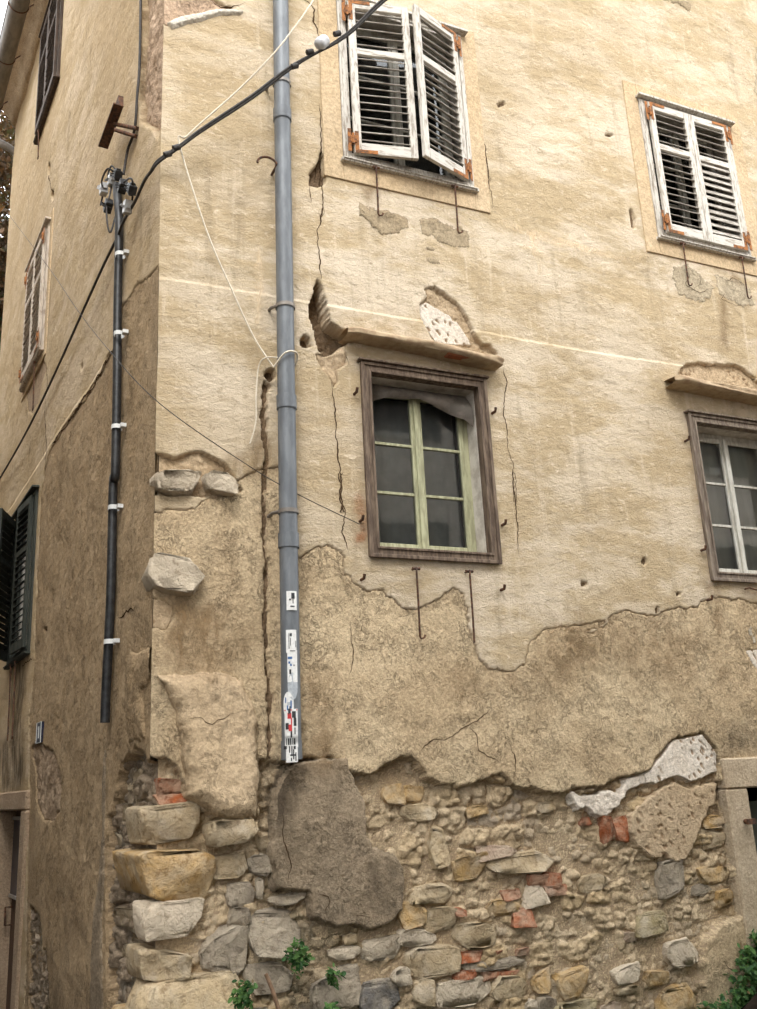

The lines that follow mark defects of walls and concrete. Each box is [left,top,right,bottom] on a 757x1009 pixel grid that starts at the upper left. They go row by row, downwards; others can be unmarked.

spalling [145,0,224,130]
crack [43,351,113,462]
crack [331,382,349,552]
crack [503,370,519,552]
peeling [25,266,757,1009]